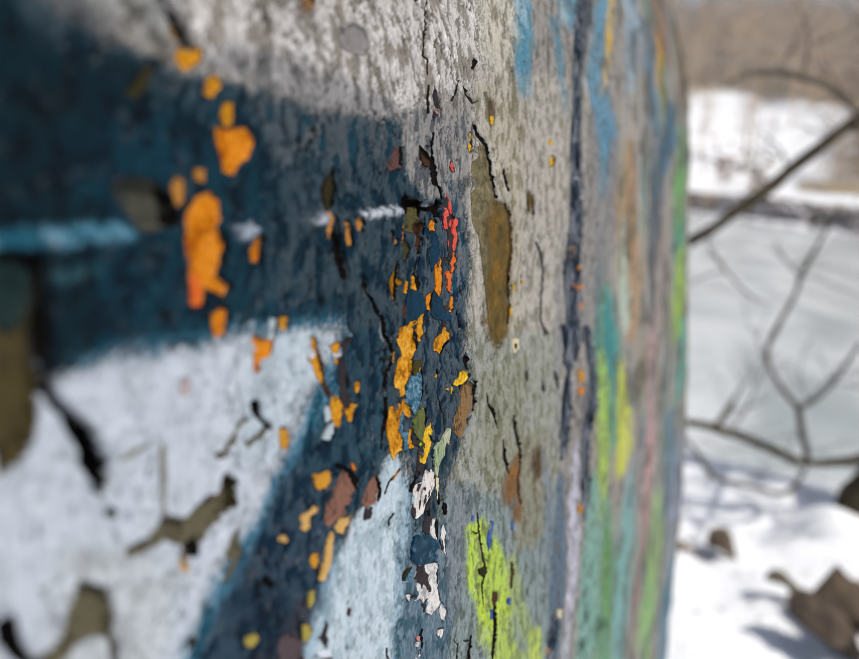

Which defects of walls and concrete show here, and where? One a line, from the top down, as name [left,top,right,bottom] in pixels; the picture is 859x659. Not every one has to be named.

peeling [201,75,255,177]
crack [414,0,443,199]
crack [451,58,478,104]
spalling [468,132,524,349]
crack [472,125,535,324]
crack [525,0,600,520]
spalling [0,251,50,475]
peeling [307,336,361,440]
spalling [297,461,382,581]
peeling [386,194,474,638]
crack [453,512,515,659]
crack [462,352,522,504]